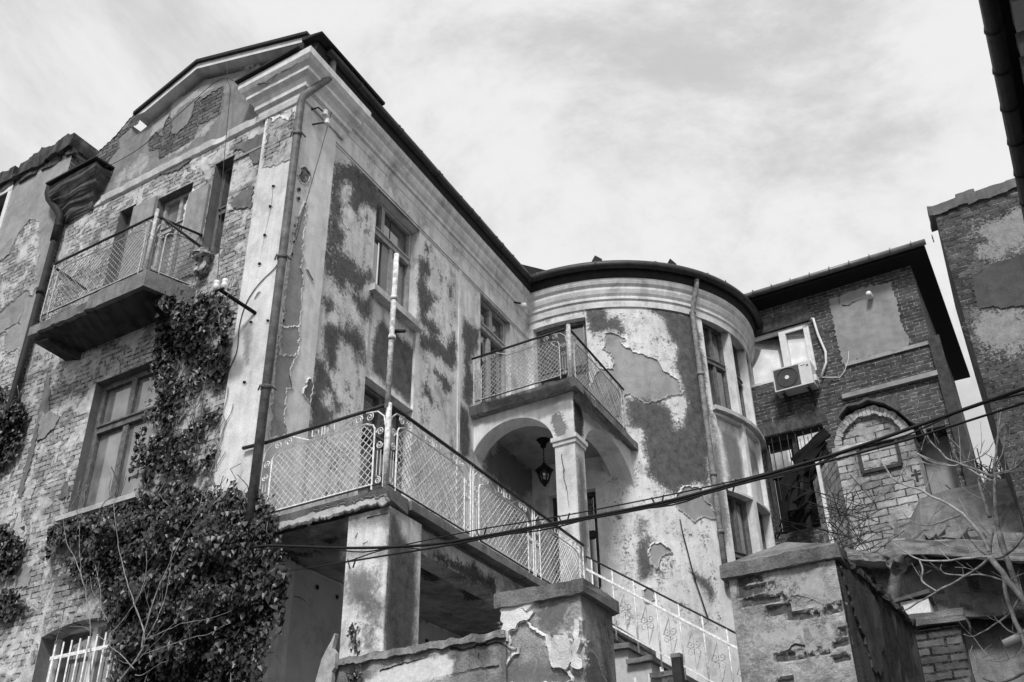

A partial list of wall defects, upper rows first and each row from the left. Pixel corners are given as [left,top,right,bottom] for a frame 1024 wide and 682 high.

flaking render [114,86,224,189]
flaking render [0,218,41,313]
flaking render [971,253,1024,310]
flaking render [231,110,481,570]
peeling [582,308,716,608]
flaking render [500,602,607,682]
flaking render [739,561,884,677]